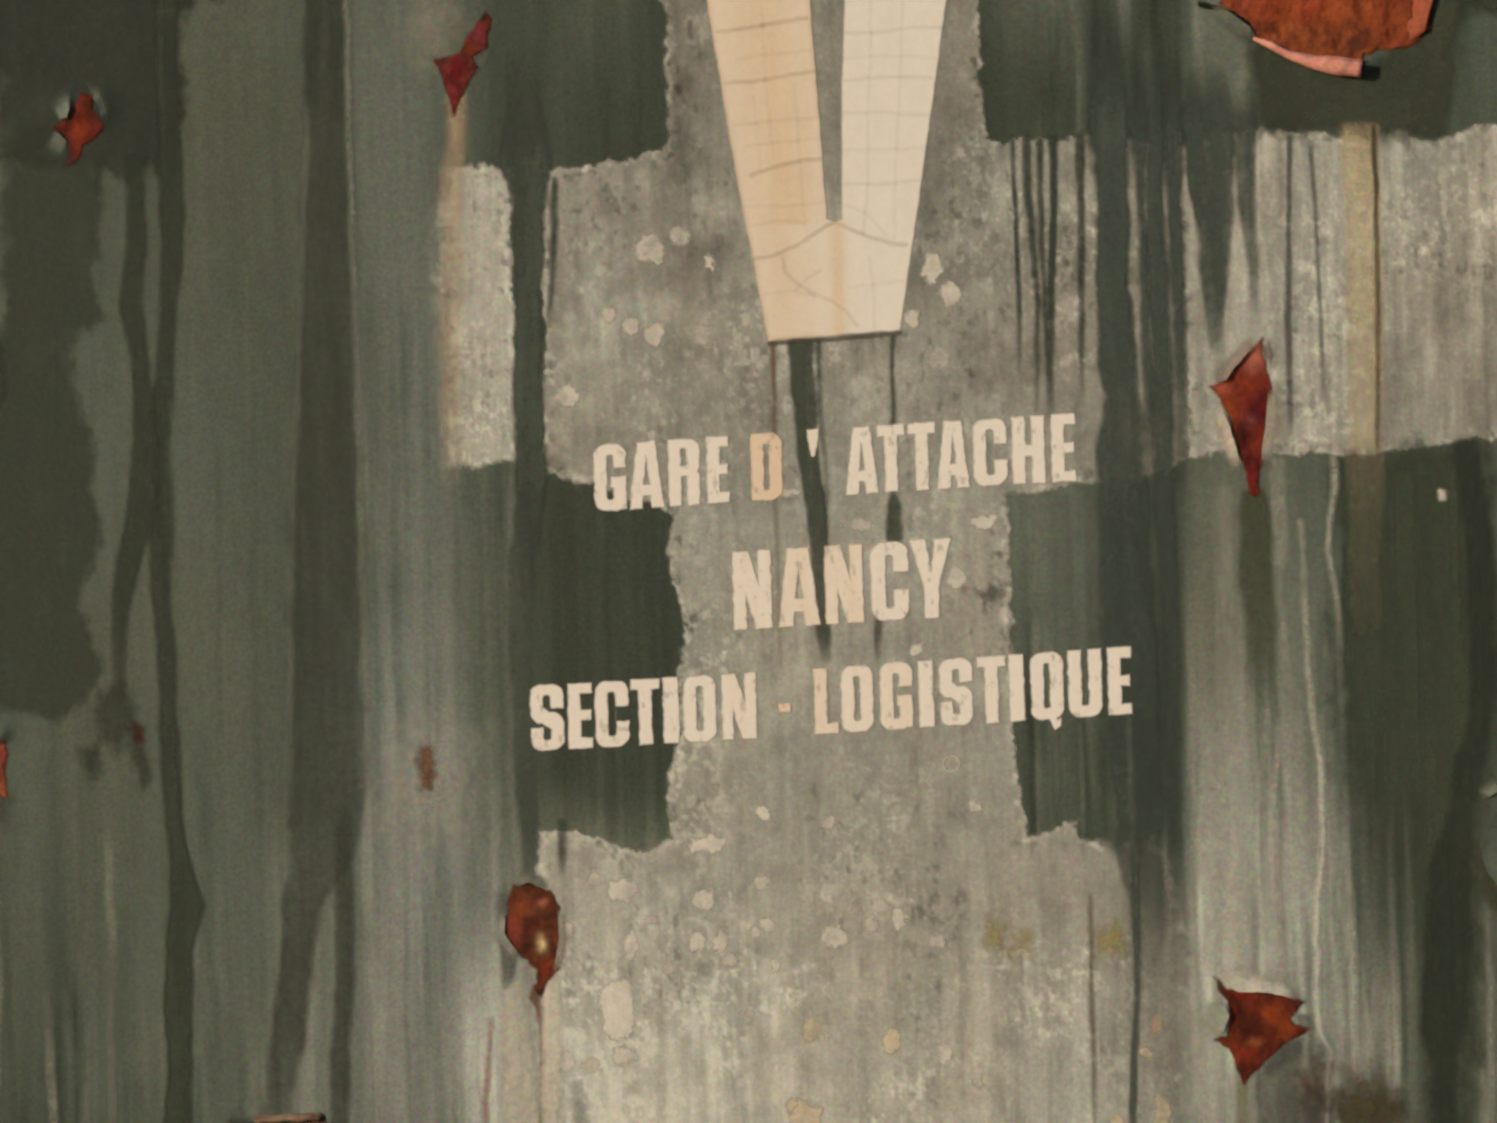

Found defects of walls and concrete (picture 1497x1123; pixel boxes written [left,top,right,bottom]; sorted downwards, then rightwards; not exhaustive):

peeling [439,163,516,469]
peeling [1126,124,1497,497]
water stain [0,0,203,1123]
peeling [497,0,1185,1123]
peeling [1481,816,1497,884]
peeling [1483,783,1497,797]